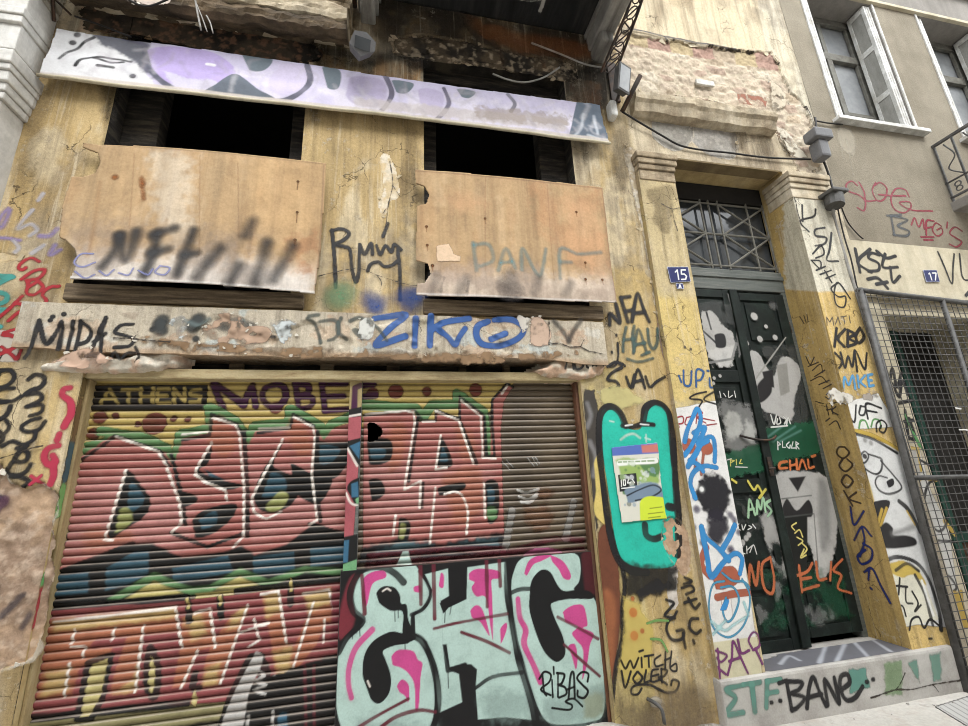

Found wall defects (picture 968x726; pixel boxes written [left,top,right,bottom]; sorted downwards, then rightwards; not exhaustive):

flaking render [388,33,577,84]
flaking render [614,27,823,173]
peeling [40,313,605,387]
peeling [828,388,879,406]
flaking render [0,464,59,670]